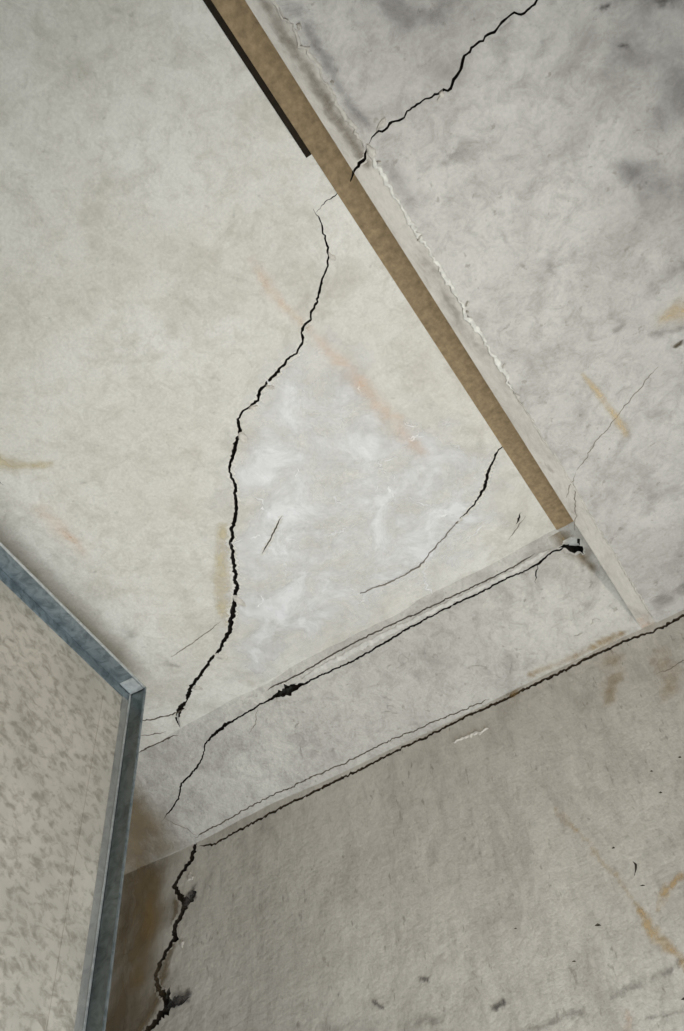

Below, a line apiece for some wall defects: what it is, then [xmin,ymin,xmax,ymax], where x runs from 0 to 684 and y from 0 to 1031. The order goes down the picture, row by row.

damp [105,798,174,1031]
crack [139,0,538,753]
crack [145,367,684,1031]